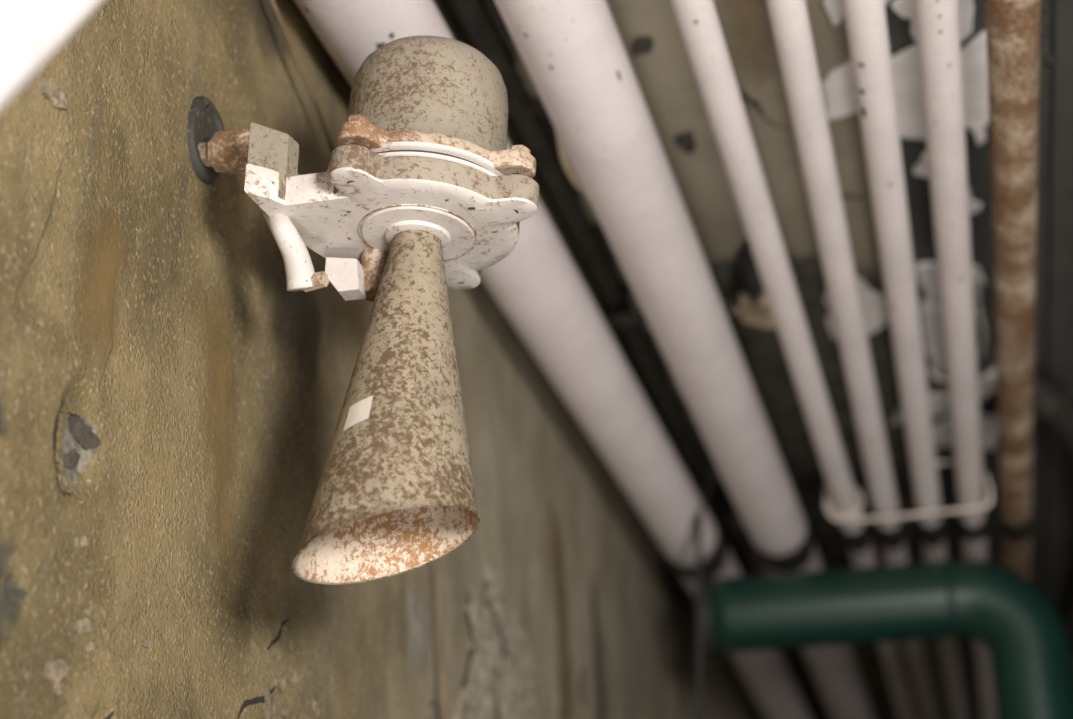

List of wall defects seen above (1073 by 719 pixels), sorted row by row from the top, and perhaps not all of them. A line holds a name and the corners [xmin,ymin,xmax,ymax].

peeling [824,0,844,26]
peeling [822,61,866,120]
peeling [884,0,929,178]
peeling [948,0,989,146]
spalling [52,397,101,497]
peeling [454,562,546,719]